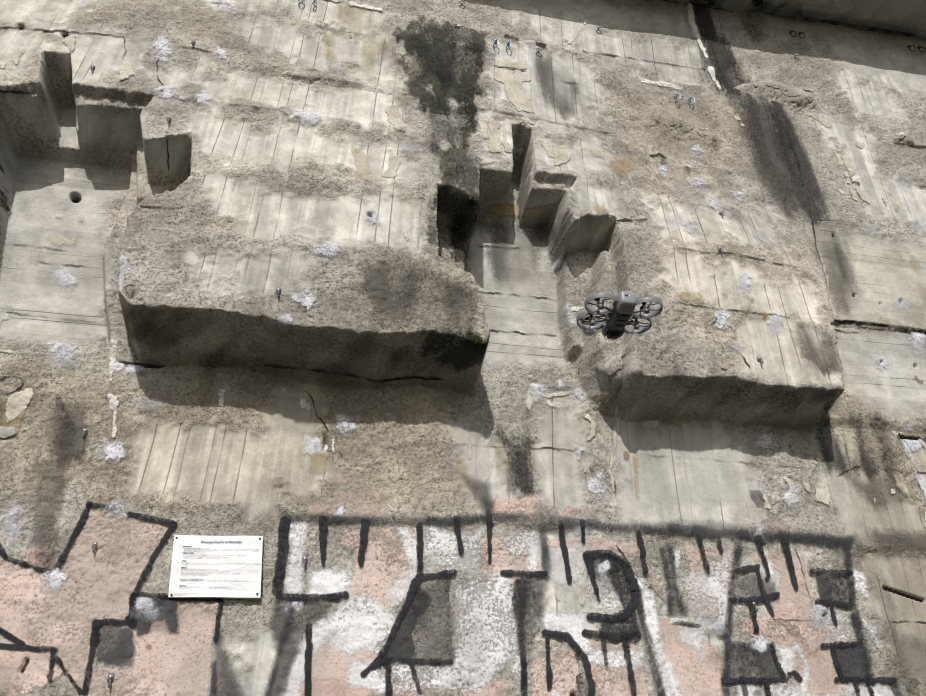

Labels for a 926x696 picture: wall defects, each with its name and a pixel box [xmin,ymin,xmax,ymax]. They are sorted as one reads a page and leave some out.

peeling [119,61,135,80]
water stain [394,17,488,205]
water stain [687,0,821,226]
crack [264,364,443,382]
peeling [527,389,609,409]
water stain [498,428,534,495]